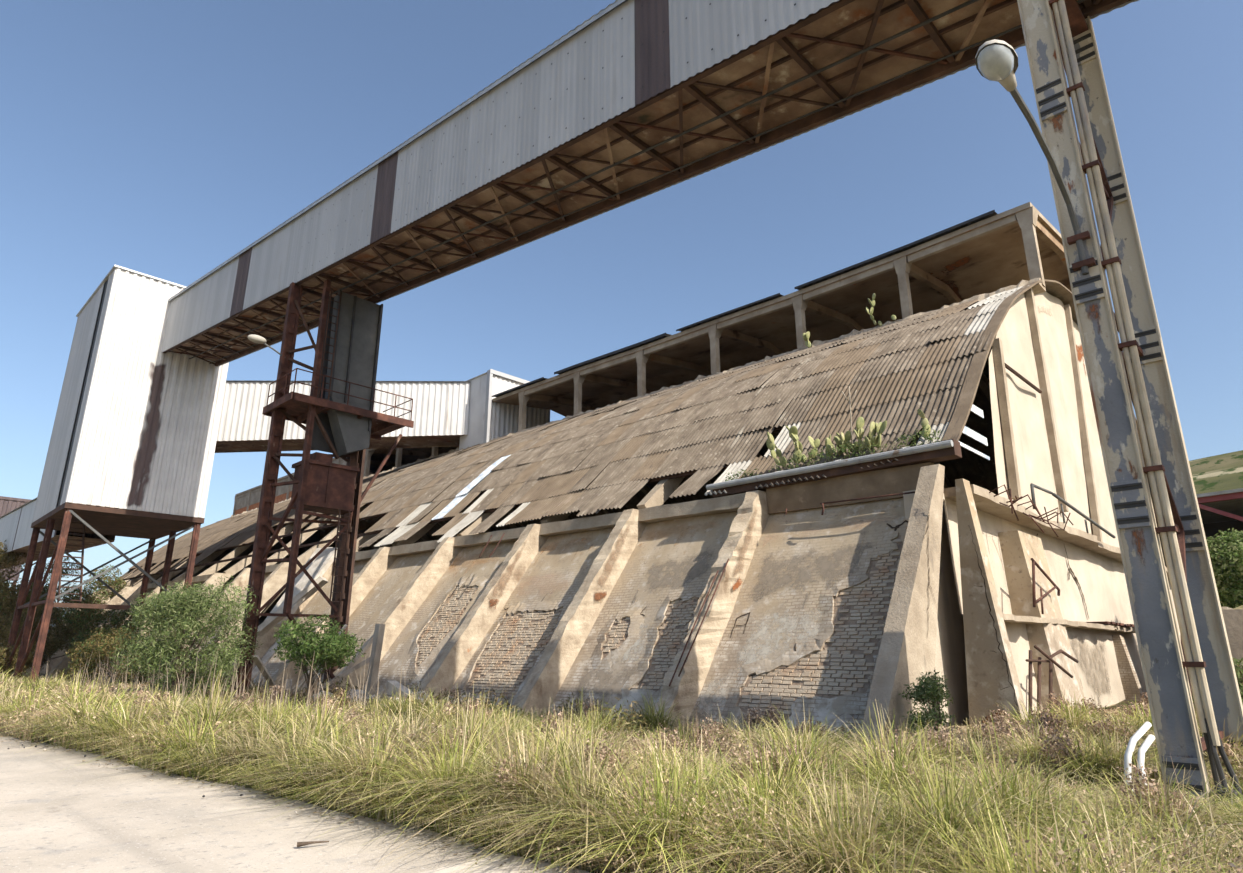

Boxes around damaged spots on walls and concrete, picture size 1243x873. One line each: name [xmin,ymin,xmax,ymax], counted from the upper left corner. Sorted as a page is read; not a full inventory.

flaking render [406,576,488,678]
flaking render [458,599,573,711]
flaking render [590,558,729,710]
flaking render [721,526,907,738]